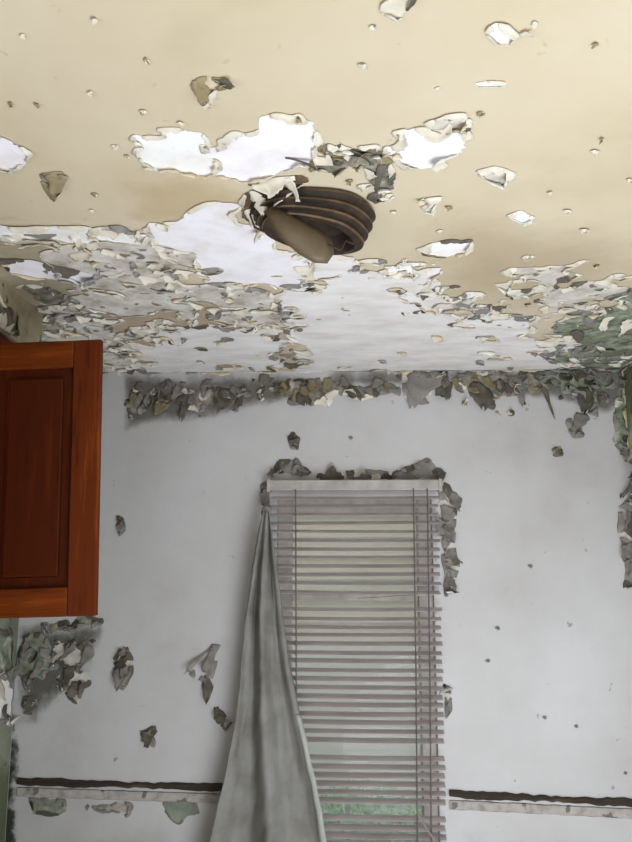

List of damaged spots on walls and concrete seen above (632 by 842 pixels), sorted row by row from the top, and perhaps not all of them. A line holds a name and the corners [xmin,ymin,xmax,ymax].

peeling [380,0,417,23]
leakage [127,378,287,423]
peeling [0,111,632,597]
leakage [332,373,401,383]
leakage [563,324,632,424]
peeling [0,616,104,727]
peeling [112,647,134,692]
peeling [185,644,232,731]
peeling [139,726,158,748]
peeling [29,797,67,817]
peeling [86,801,134,818]
peeling [162,801,200,825]